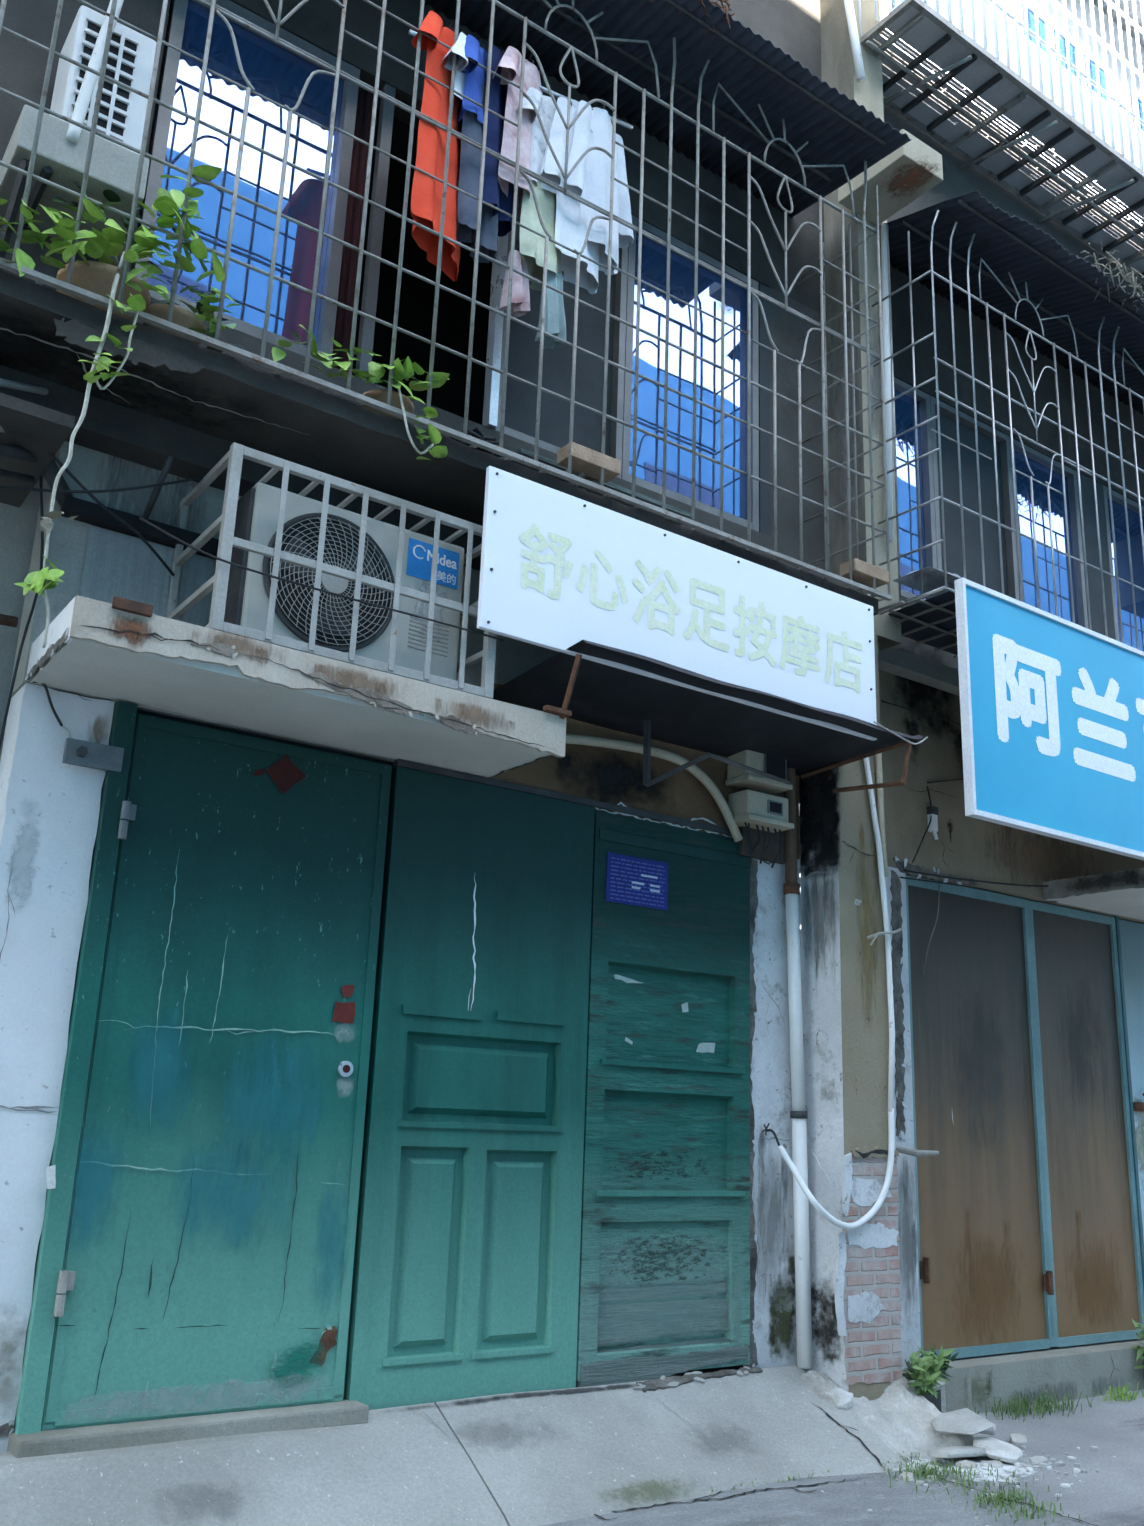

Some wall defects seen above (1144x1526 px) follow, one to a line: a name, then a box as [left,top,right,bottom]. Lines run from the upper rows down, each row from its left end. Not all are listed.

rust [887,162,938,196]
spalling [25,627,69,680]
rust [113,618,150,646]
crack [81,625,557,778]
leakage [559,754,664,802]
flaking render [835,855,978,1385]
leakage [759,1133,840,1361]